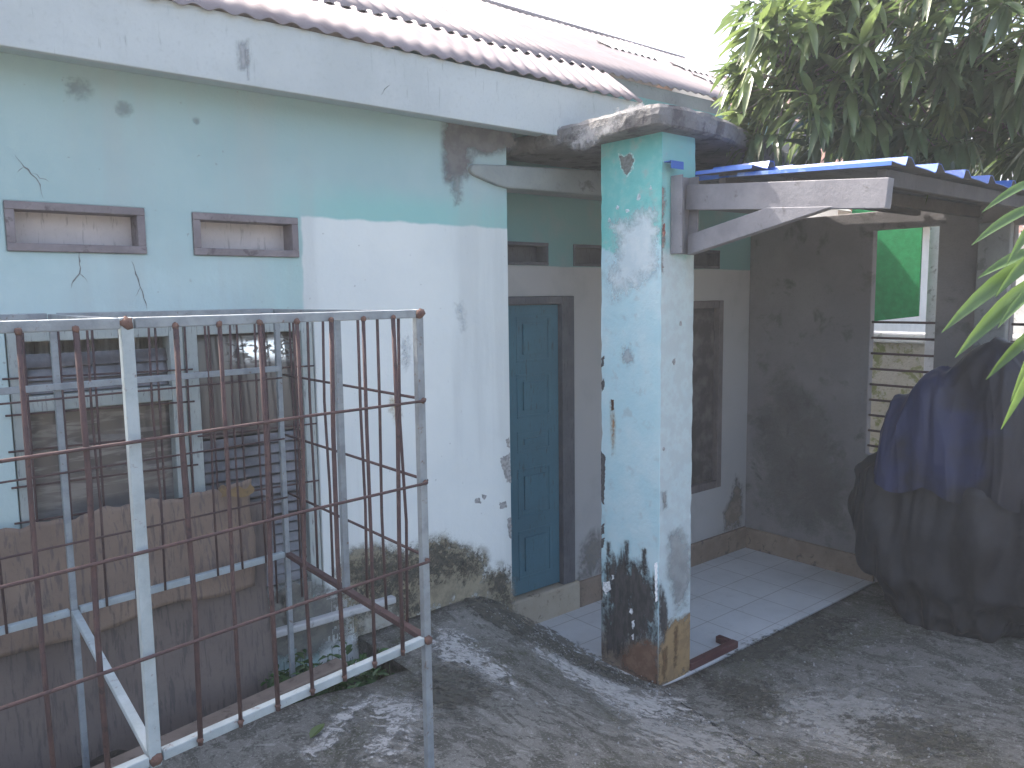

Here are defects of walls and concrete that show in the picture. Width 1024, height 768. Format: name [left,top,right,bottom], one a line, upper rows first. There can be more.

crack [15,155,48,197]
spalling [618,152,635,178]
peeling [608,186,666,298]
peeling [500,438,511,483]
water stain [268,537,515,661]
water stain [579,532,690,659]